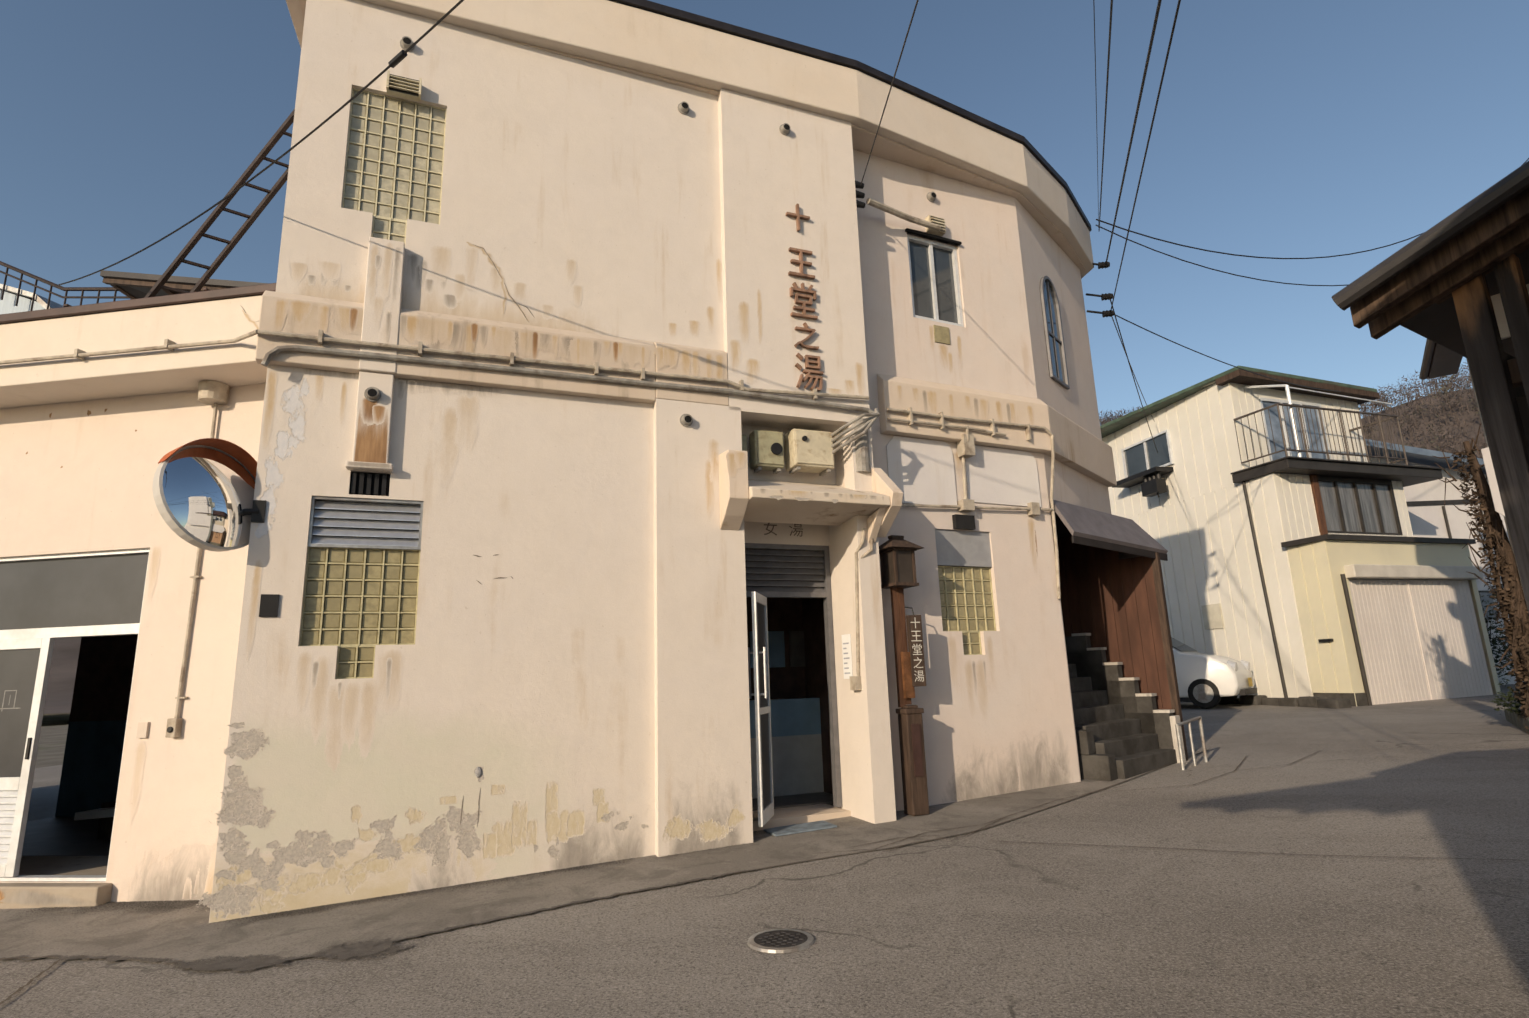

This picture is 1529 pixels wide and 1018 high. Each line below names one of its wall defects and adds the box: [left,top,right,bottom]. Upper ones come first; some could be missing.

water stain [286,242,651,373]
crack [467,242,534,322]
peeling [254,377,310,539]
spalling [196,722,746,919]